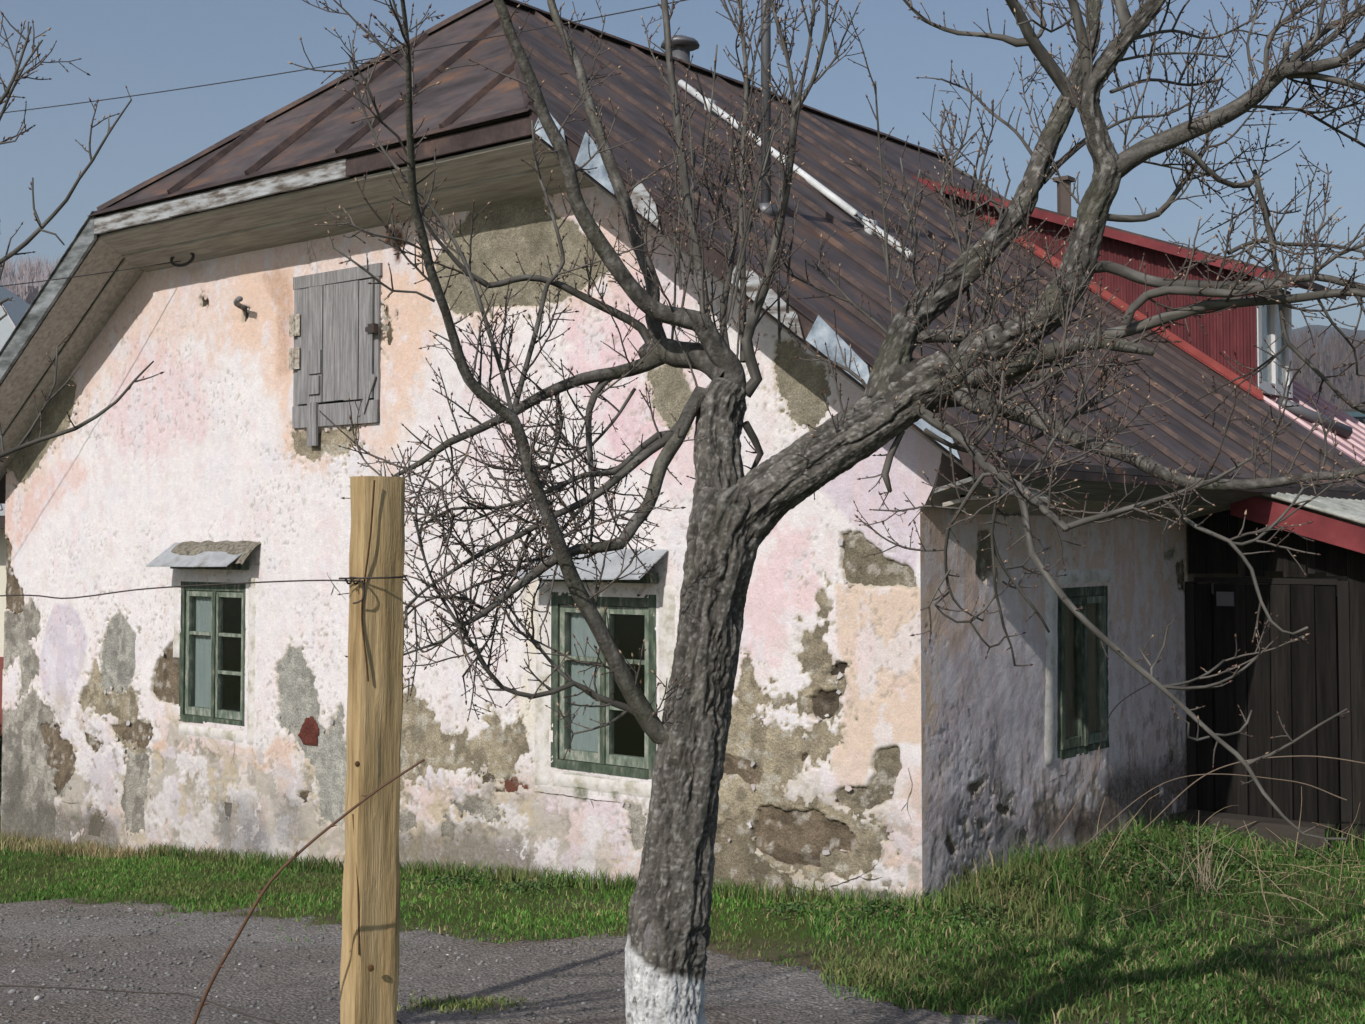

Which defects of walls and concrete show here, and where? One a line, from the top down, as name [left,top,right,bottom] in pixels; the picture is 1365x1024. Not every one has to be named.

peeling [435,195,609,323]
peeling [647,364,693,435]
peeling [774,341,831,431]
peeling [1,536,179,842]
flaking render [275,646,347,833]
peeling [399,683,533,841]
peeling [717,532,916,902]